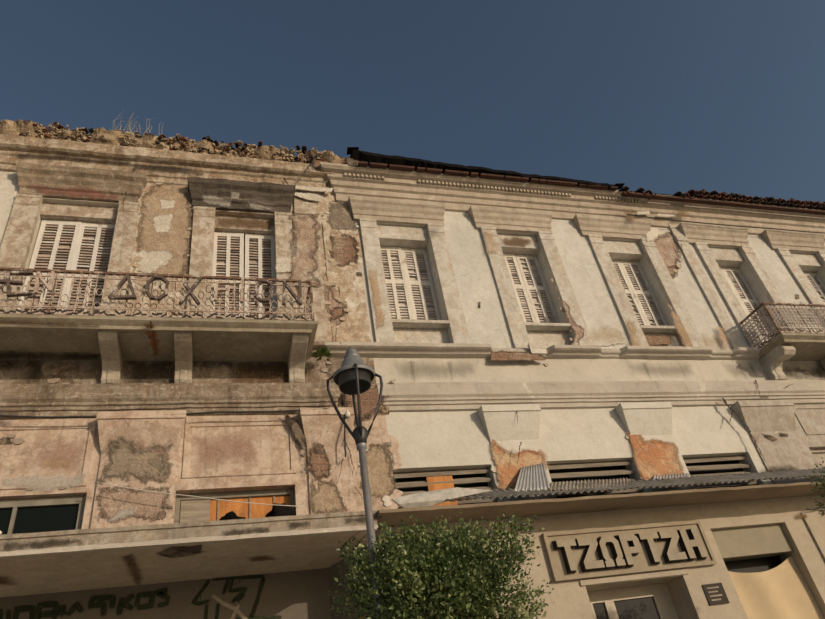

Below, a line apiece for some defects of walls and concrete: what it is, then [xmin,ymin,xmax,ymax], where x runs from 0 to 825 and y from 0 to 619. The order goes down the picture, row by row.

flaking render [275,185,384,332]
flaking render [654,228,687,284]
flaking render [559,297,584,345]
flaking render [317,357,344,383]
flaking render [96,436,178,524]
flaking render [340,384,389,425]
flaking render [351,435,403,510]
flaking render [491,440,549,498]
flaking render [625,432,683,480]
crack [722,398,765,461]